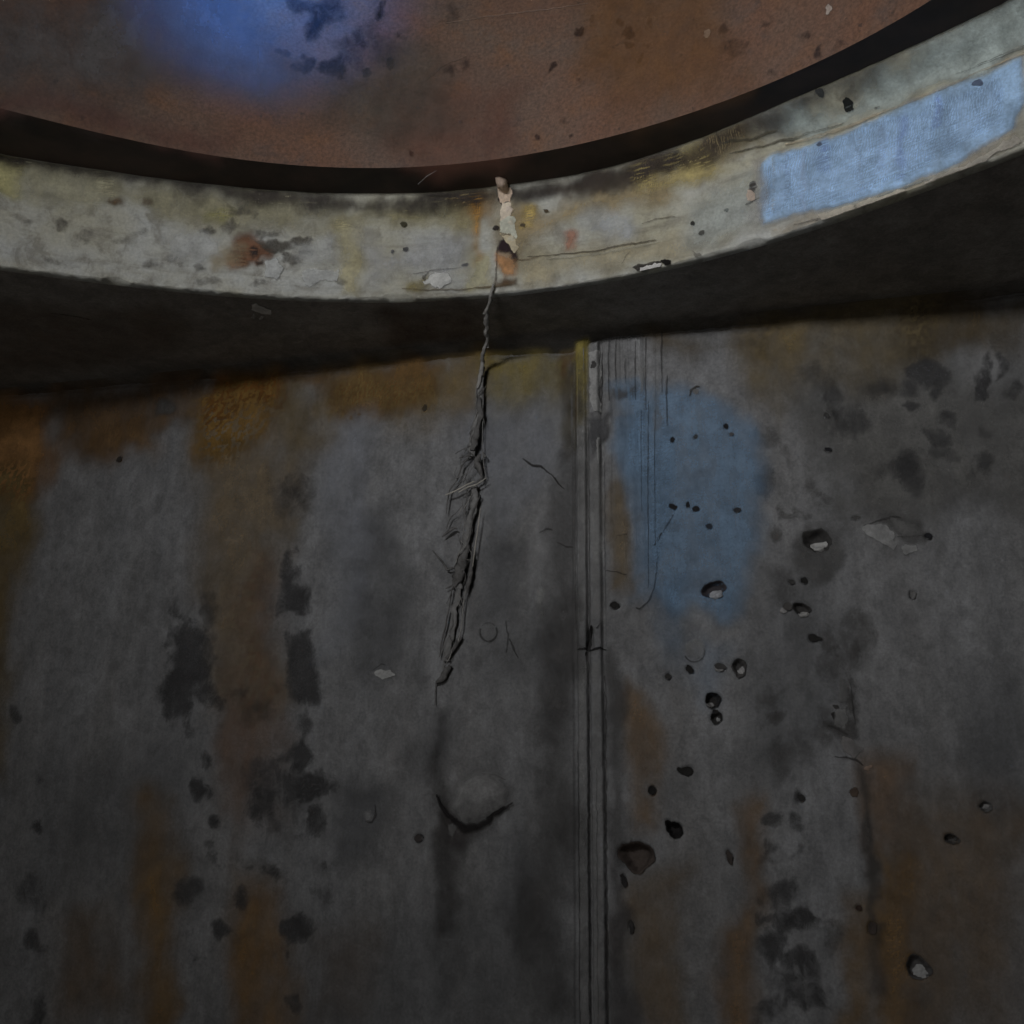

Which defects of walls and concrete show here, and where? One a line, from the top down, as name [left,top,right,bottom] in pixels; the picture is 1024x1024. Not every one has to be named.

corrosion [228,235,272,268]
spalling [405,267,510,290]
spalling [633,259,671,271]
spalling [802,528,832,552]
spalling [861,514,923,555]
water stain [280,552,310,615]
spalling [701,580,727,599]
water stain [160,623,217,718]
water stain [285,629,319,704]
water stain [252,742,334,833]
spalling [617,841,655,874]